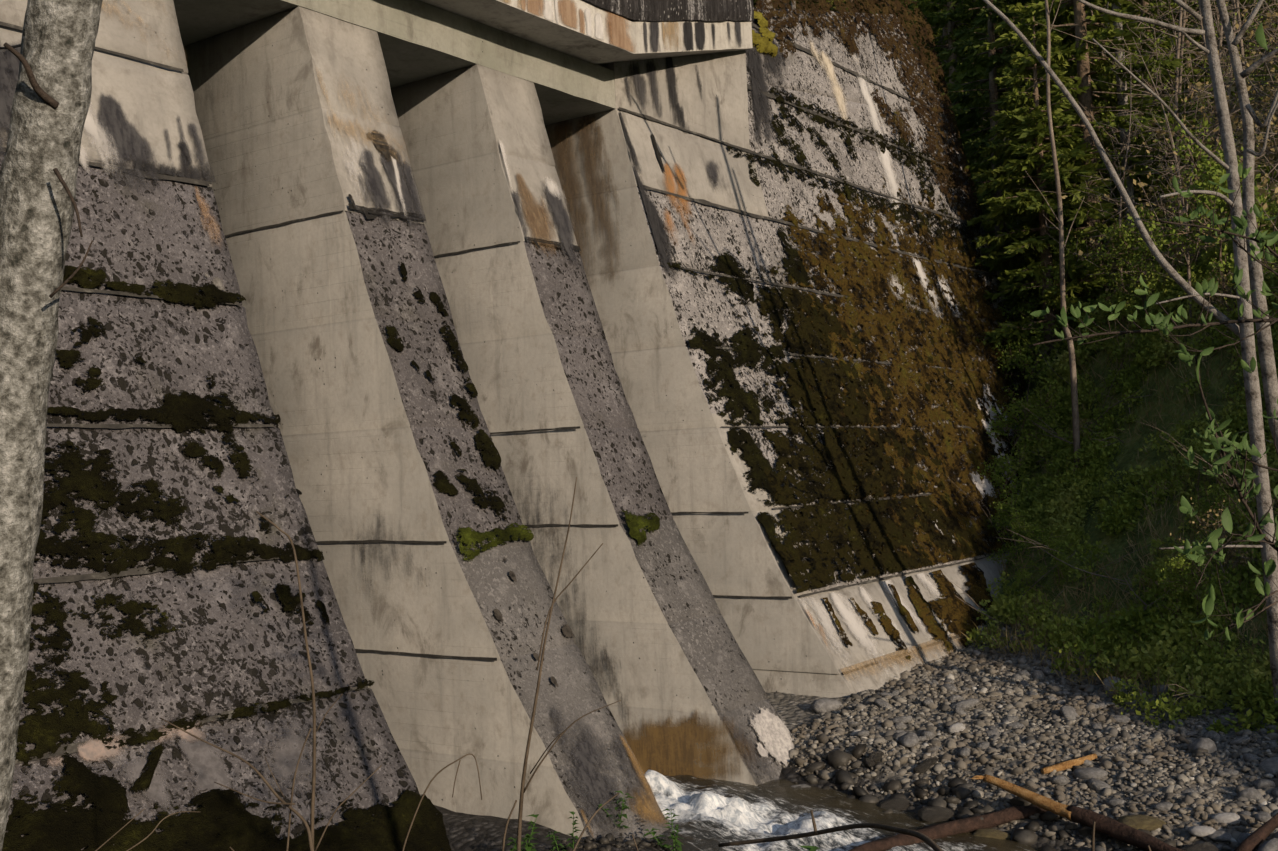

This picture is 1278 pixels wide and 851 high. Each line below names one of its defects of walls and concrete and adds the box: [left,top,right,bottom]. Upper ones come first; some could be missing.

corrosion [503,0,585,34]
corrosion [607,12,634,52]
damp [683,21,787,143]
damp [80,94,216,189]
damp [619,22,690,280]
corrosion [664,164,689,230]
damp [707,162,718,186]
damp [552,704,774,837]